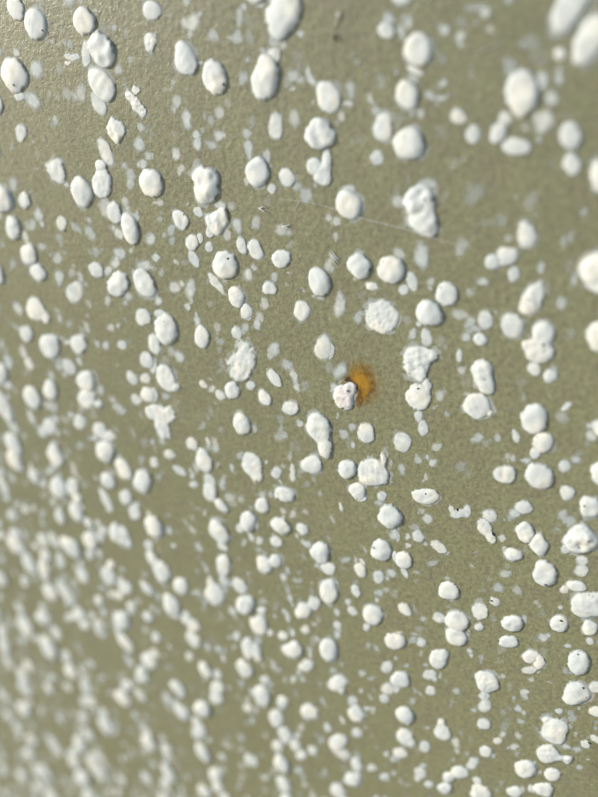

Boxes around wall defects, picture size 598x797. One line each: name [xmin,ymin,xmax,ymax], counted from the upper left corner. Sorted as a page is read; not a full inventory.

rust [345,366,373,406]